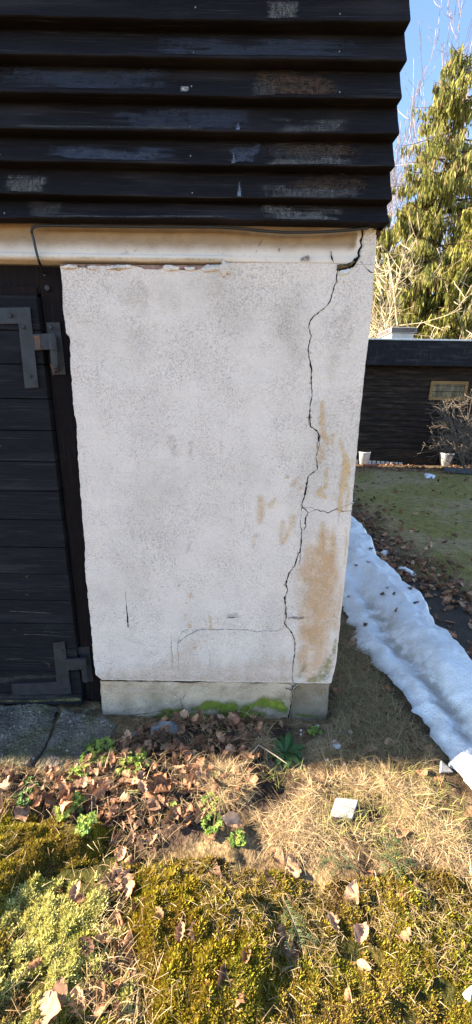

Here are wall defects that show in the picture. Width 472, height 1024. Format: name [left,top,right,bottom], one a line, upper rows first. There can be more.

flaking render [60,264,220,272]
crack [128,251,373,718]